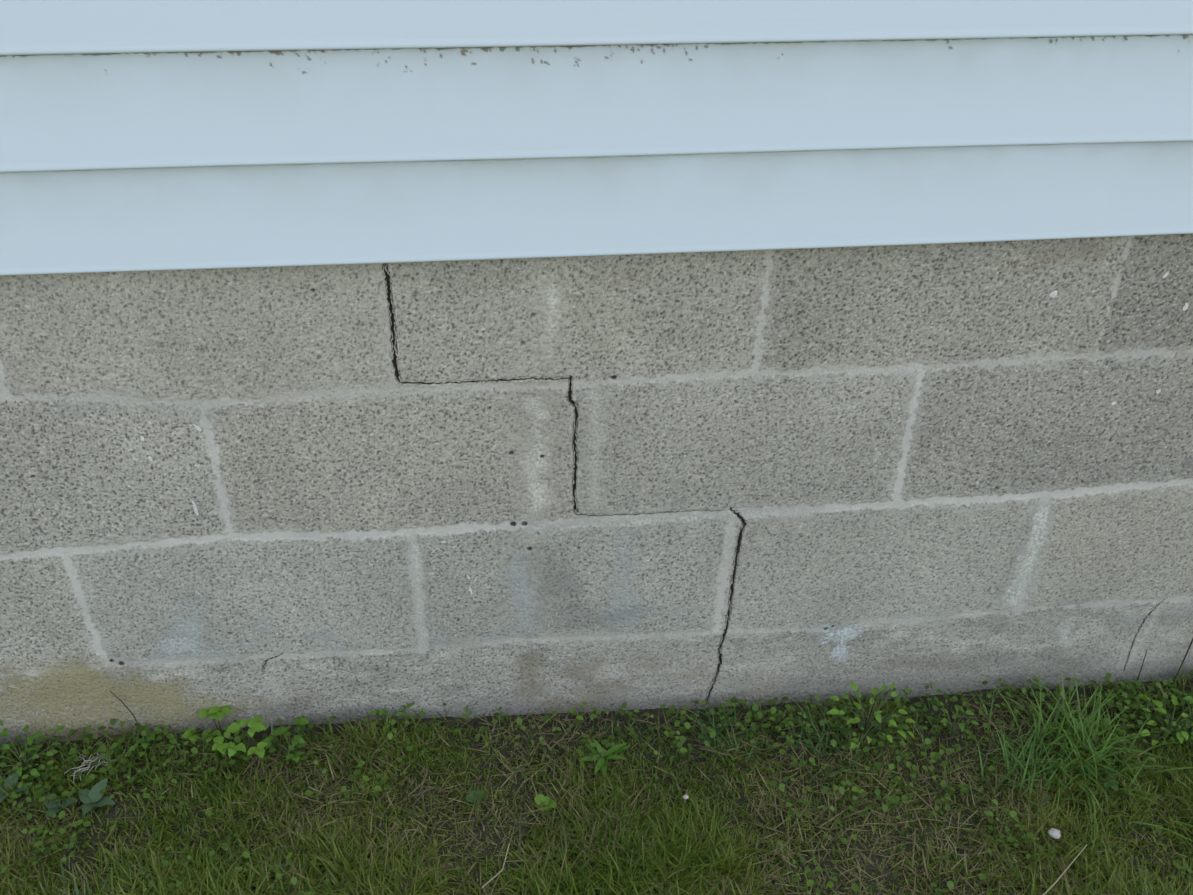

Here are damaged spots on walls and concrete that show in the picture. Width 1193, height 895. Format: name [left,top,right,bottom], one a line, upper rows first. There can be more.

crack [383,266,747,705]